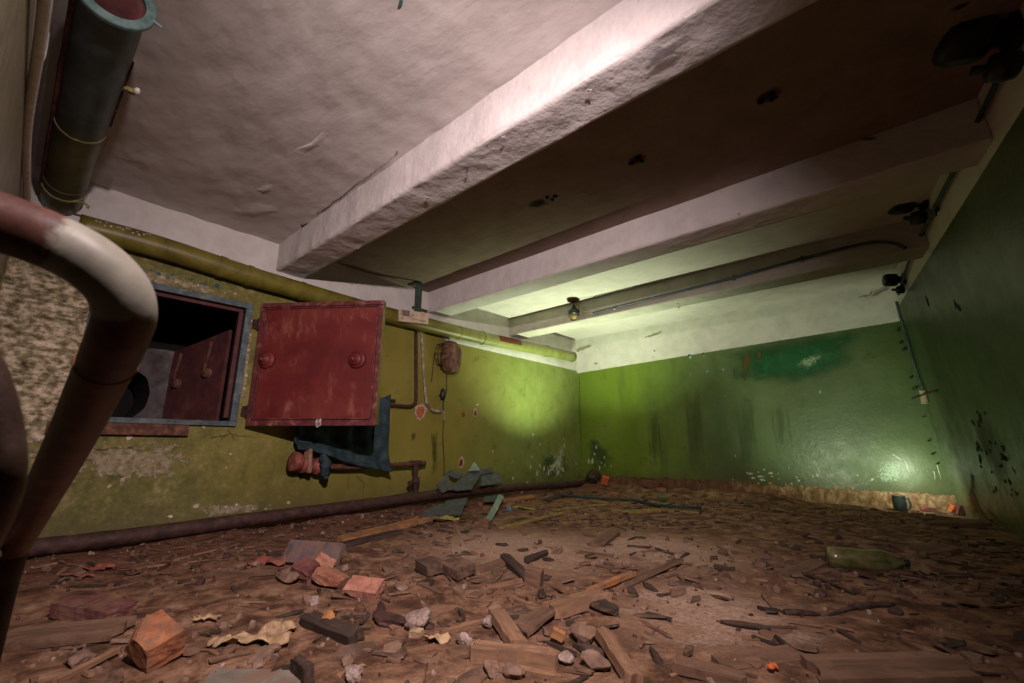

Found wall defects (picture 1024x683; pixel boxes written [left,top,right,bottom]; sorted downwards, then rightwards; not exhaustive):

peeling [73,435,192,489]
flaking render [597,466,957,514]